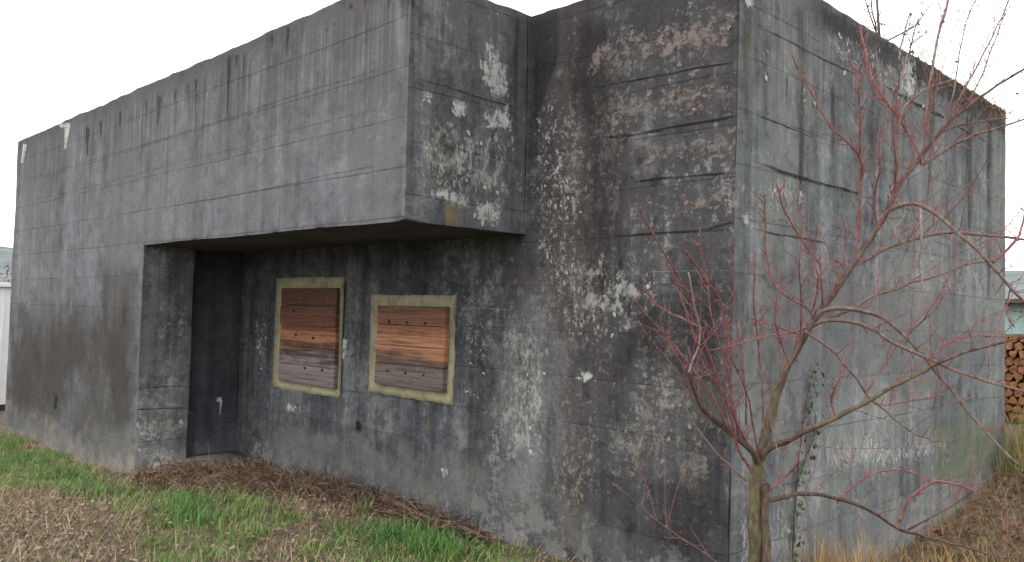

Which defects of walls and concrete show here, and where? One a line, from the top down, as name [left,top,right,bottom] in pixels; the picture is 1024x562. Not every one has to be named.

spalling [589,12,734,74]
spalling [598,81,728,122]
leakage [824,11,1005,182]
peeling [423,43,514,227]
spalling [630,136,726,165]